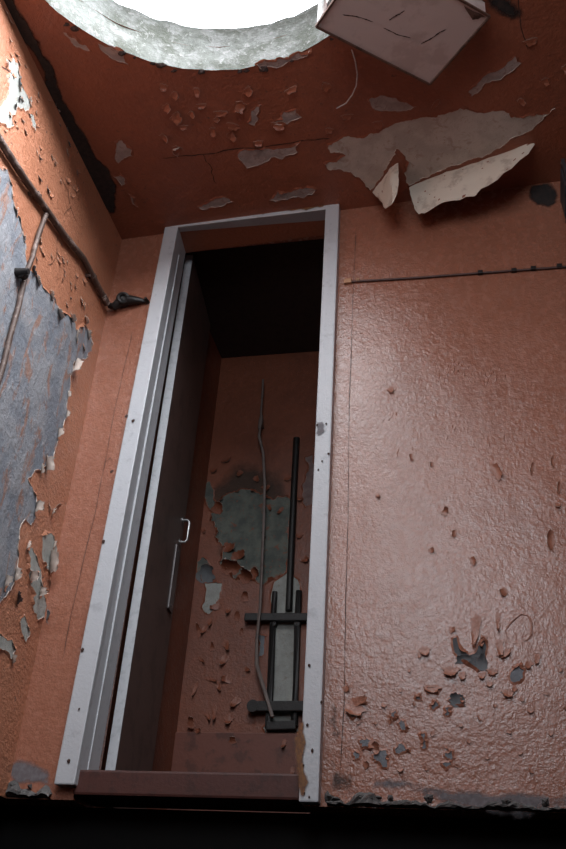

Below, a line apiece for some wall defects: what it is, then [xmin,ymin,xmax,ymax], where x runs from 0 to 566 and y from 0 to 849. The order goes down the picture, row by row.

peeling [0,51,61,135]
peeling [209,86,304,169]
peeling [323,94,555,214]
peeling [0,166,94,665]
peeling [191,445,330,701]
peeling [343,685,368,724]
peeling [351,702,436,772]
peeling [412,684,466,718]
peeling [440,613,511,687]
peeling [500,653,541,713]
spalling [5,780,52,799]
spalling [324,791,566,812]